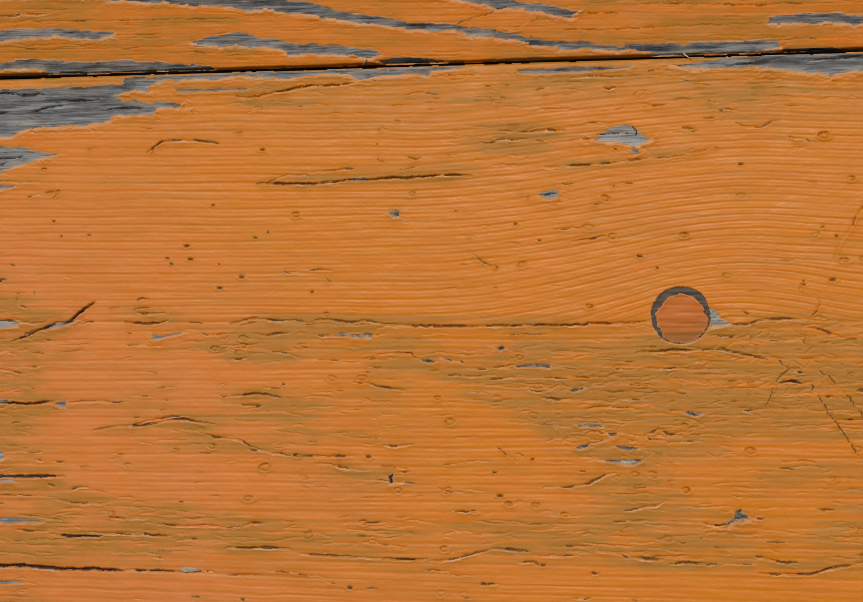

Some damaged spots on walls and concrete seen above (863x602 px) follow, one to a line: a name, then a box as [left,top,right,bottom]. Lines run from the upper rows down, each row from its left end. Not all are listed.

peeling [0,28,114,42]
peeling [111,0,863,77]
peeling [0,59,462,174]
peeling [594,125,649,155]
crack [267,168,354,185]
crack [0,264,111,341]
crack [412,322,610,335]
crack [649,312,830,398]
crack [0,372,58,424]
crack [112,373,192,427]
crack [0,452,86,541]
crack [0,517,195,572]